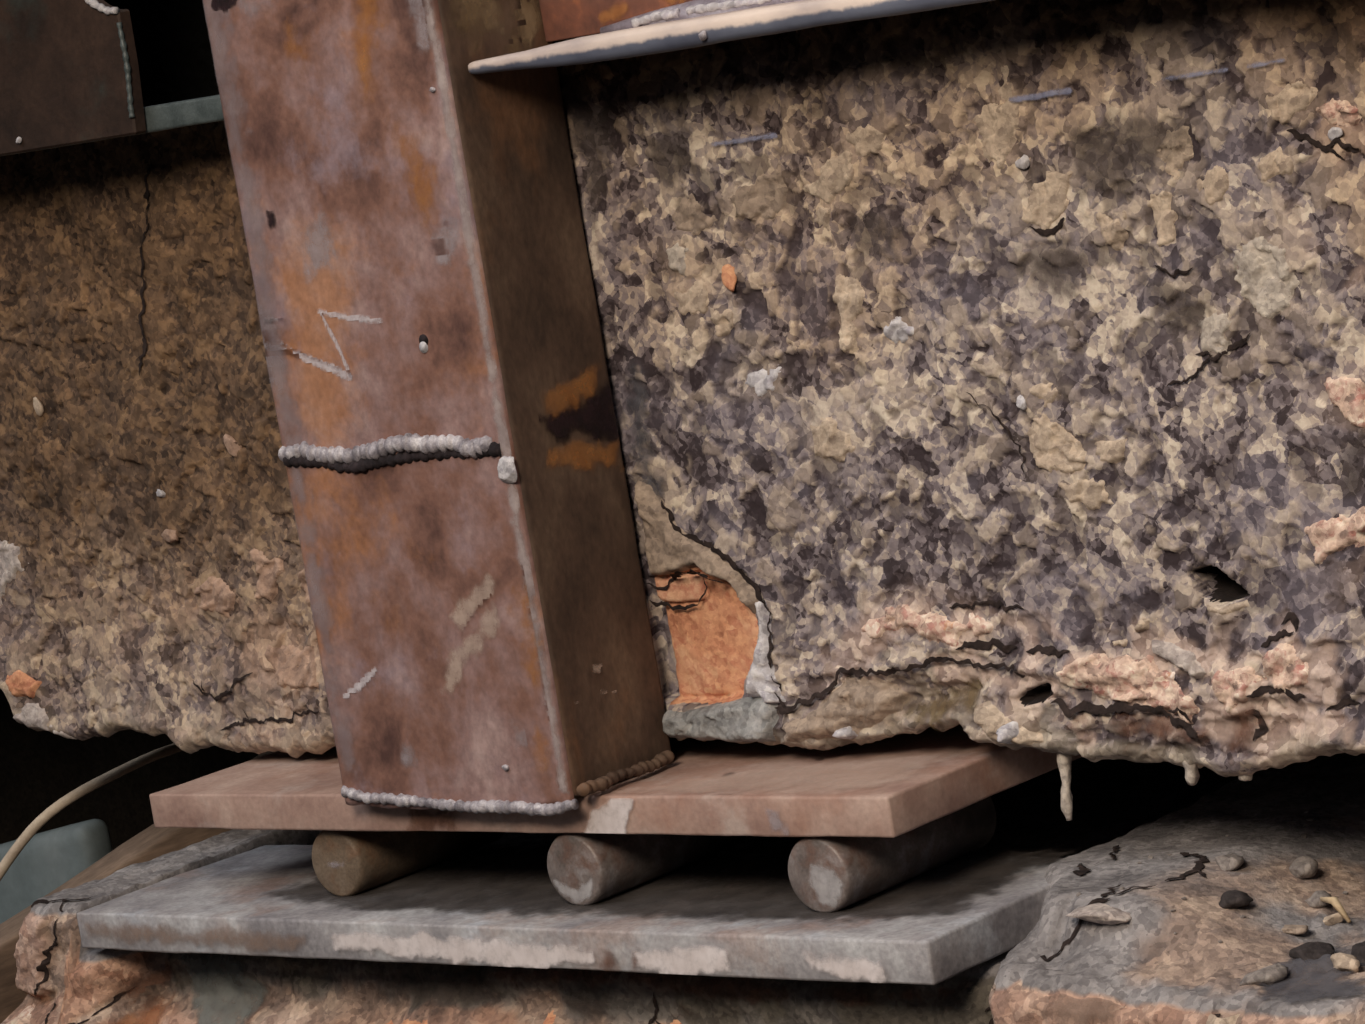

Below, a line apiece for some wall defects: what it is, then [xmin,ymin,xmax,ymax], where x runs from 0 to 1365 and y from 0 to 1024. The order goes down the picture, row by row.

crack [138,159,152,376]
spalling [634,474,786,743]
crack [1261,612,1298,647]
crack [1051,698,1199,741]
crack [1246,685,1360,741]
crack [31,896,137,1024]
crack [648,993,661,1024]
crack [1040,845,1209,961]